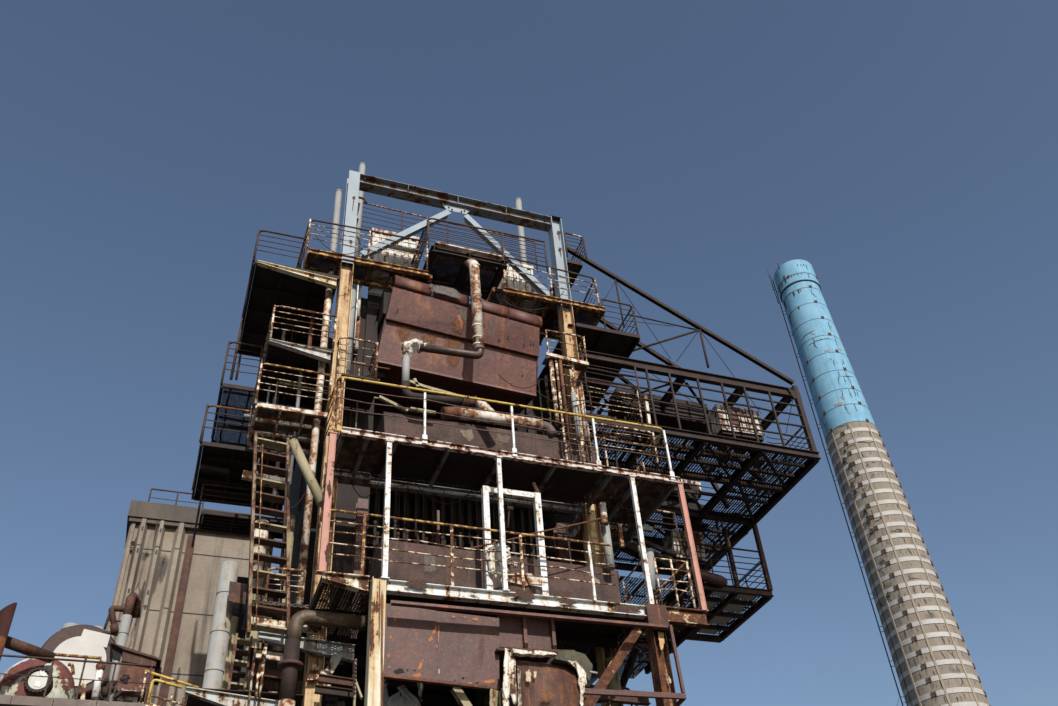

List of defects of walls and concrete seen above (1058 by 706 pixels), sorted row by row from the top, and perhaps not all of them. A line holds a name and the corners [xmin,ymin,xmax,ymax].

corrosion [423,314,464,365]
corrosion [405,579,428,590]